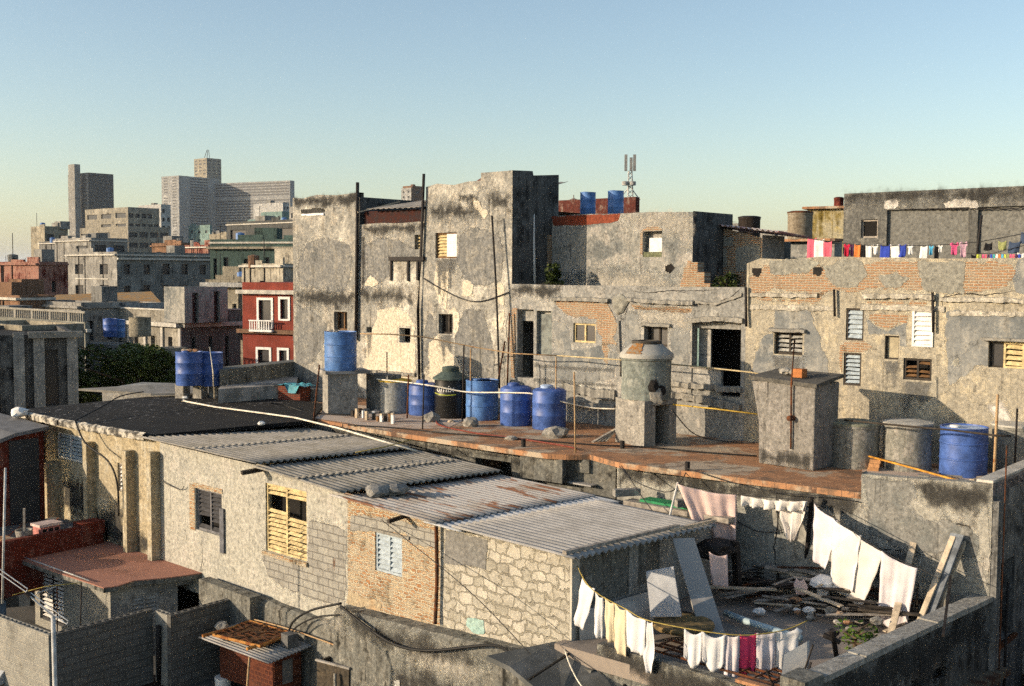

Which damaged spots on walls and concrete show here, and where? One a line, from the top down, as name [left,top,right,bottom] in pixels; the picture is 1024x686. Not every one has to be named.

damp [297,195,477,310]
peeling [363,198,517,382]
peeling [553,301,692,386]
spalling [723,237,927,375]
peeling [945,310,1024,385]
spalling [963,258,1024,294]
peeling [989,402,1011,421]
peeling [863,477,991,596]